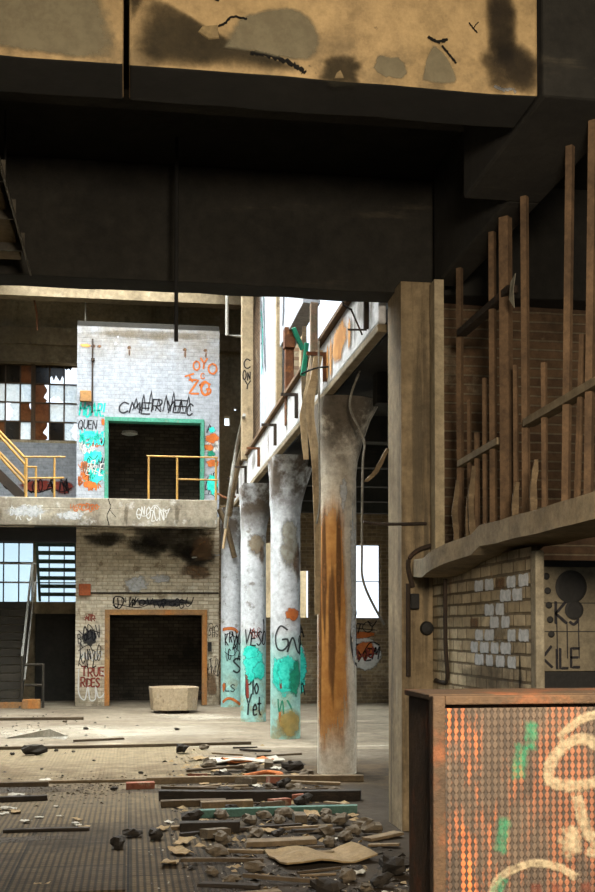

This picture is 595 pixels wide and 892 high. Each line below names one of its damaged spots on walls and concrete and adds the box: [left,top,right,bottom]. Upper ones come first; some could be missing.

leakage [141,3,283,67]
flaking render [198,9,319,74]
leakage [322,57,359,86]
flaking render [374,56,407,78]
flaking render [423,36,457,83]
corrosion [318,505,348,746]